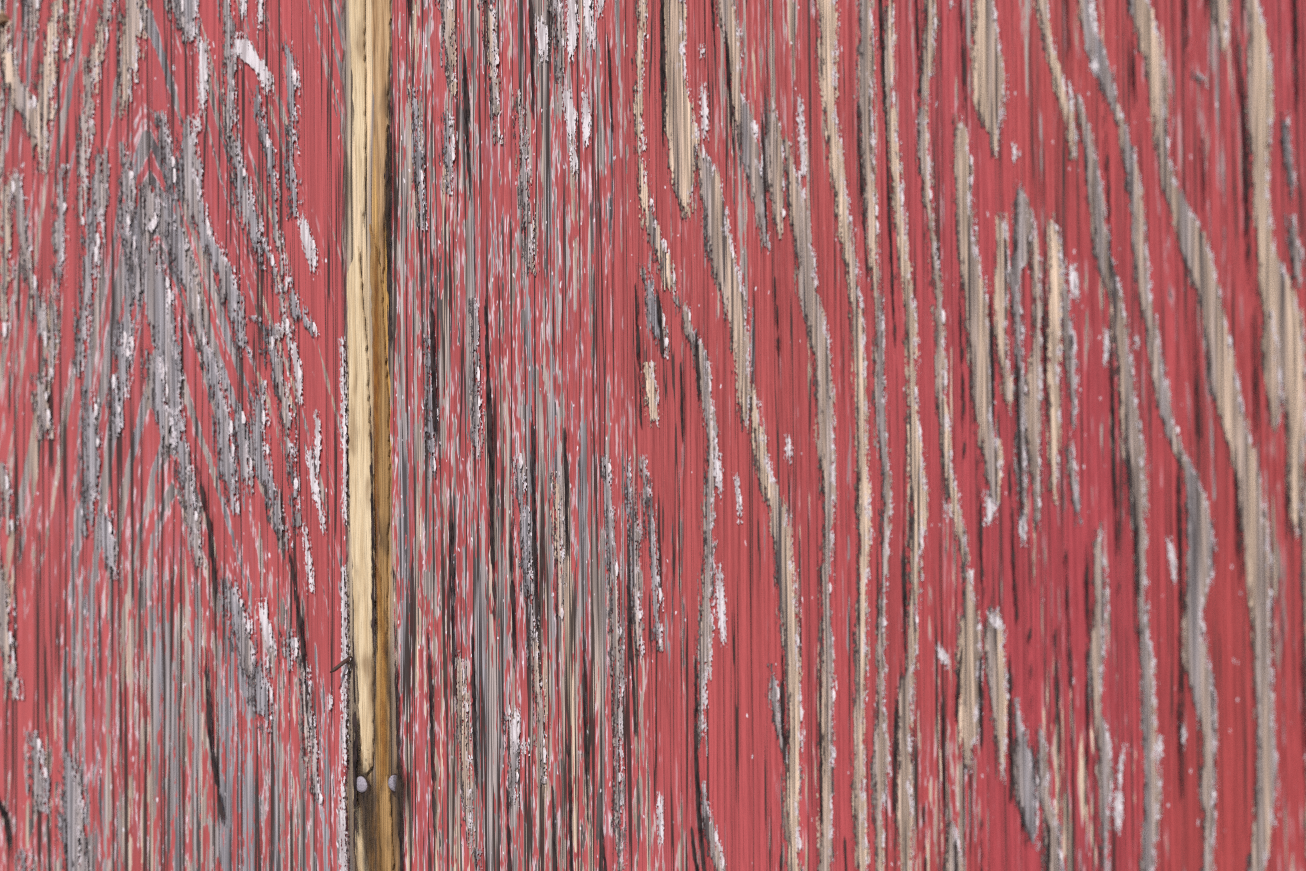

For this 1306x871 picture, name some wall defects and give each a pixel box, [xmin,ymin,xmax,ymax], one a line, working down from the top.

peeling [0,0,326,595]
peeling [339,336,348,525]
peeling [407,0,459,230]
peeling [478,0,539,276]
peeling [535,0,617,174]
peeling [629,0,1220,871]
peeling [1126,0,1280,871]
peeling [1211,0,1306,658]
peeling [23,730,91,871]
peeling [217,565,351,871]
peeling [500,453,567,809]
peeling [598,454,664,871]